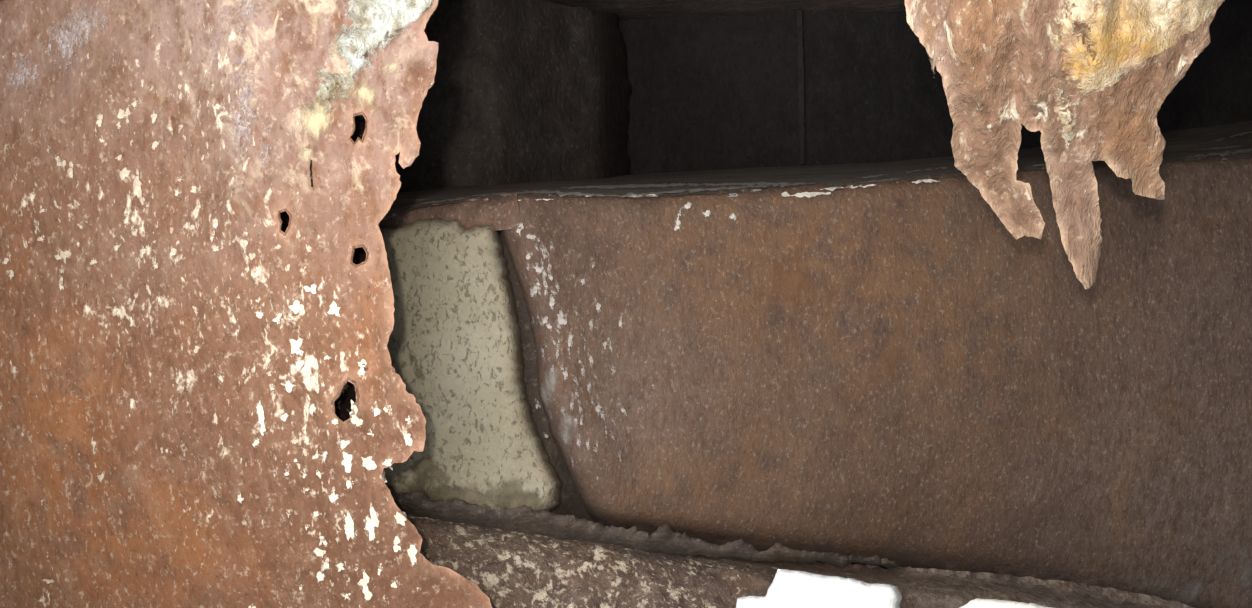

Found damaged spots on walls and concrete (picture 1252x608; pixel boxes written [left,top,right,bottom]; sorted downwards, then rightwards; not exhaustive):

peeling [96,98,138,143]
peeling [115,155,150,212]
peeling [424,167,948,231]
peeling [255,284,317,324]
peeling [270,338,304,393]
peeling [252,400,266,447]
peeling [331,400,392,437]
peeling [284,439,393,503]
peeling [305,510,345,583]
peeling [344,503,380,541]
peeling [393,512,418,567]
peeling [341,563,398,601]